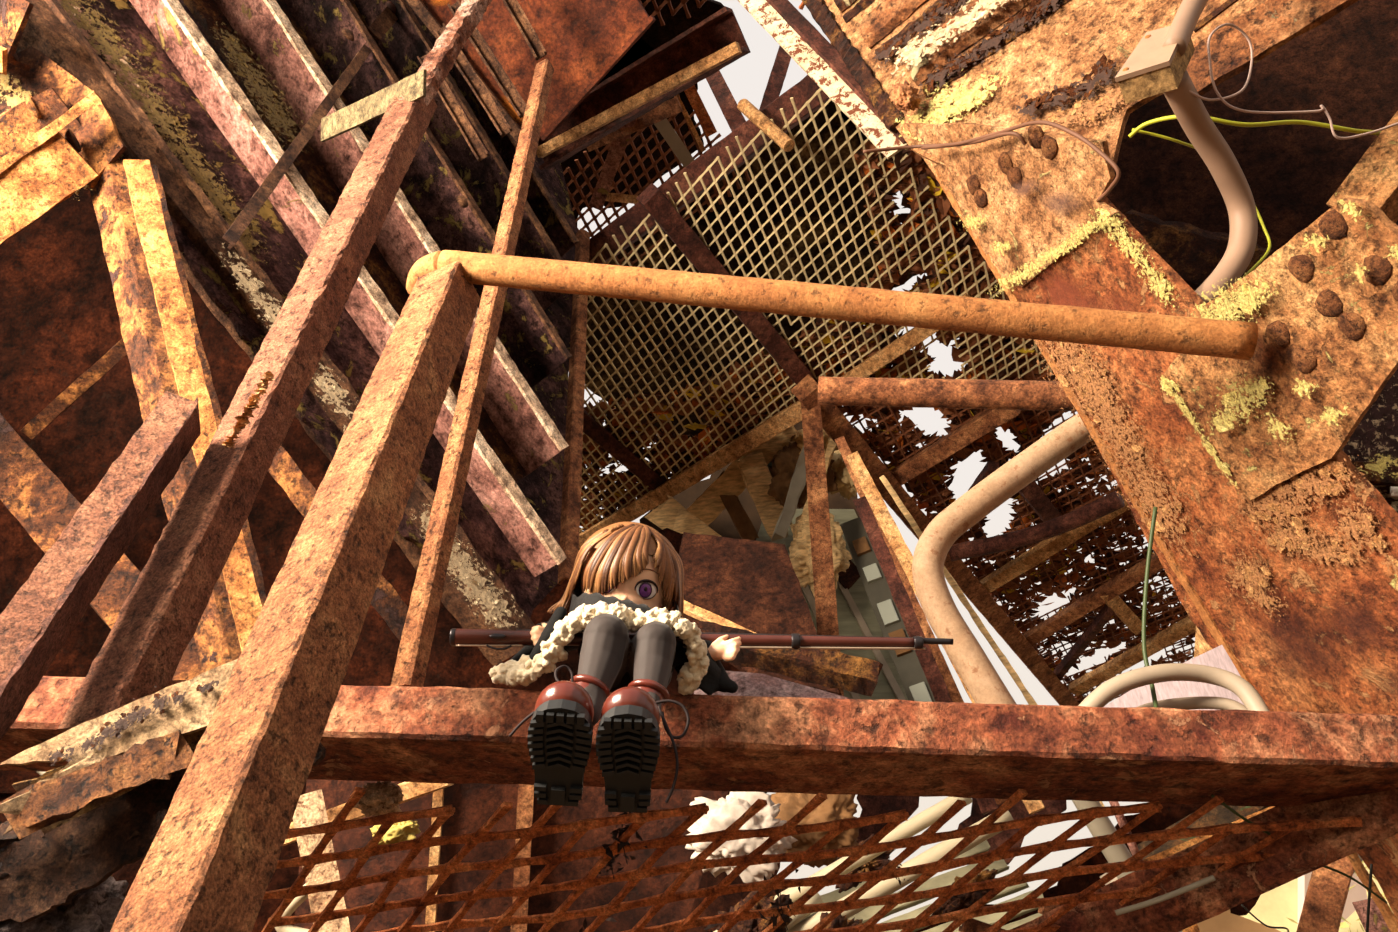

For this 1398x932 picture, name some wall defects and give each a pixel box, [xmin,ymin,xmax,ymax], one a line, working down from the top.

peeling [878,0,1021,78]
peeling [0,72,35,110]
peeling [58,0,282,330]
rust [222,371,275,449]
peeling [312,362,358,431]
peeling [1028,339,1210,573]
peeling [1160,373,1398,626]
rust [0,730,195,845]
rust [301,779,403,810]
rust [332,783,788,932]
rust [857,795,920,844]
rust [958,798,1067,865]